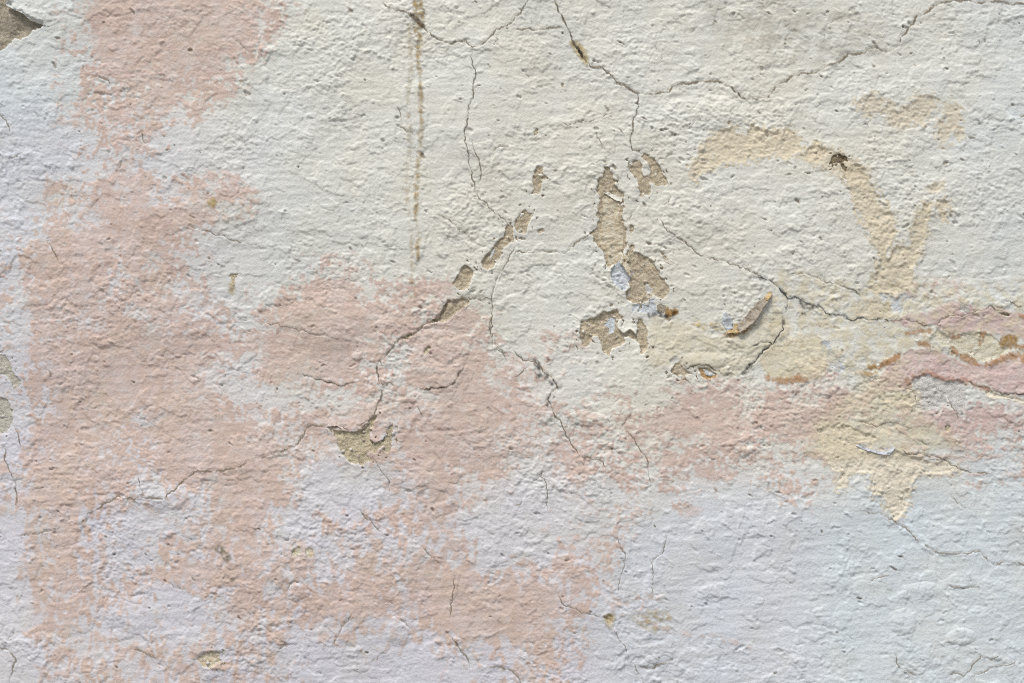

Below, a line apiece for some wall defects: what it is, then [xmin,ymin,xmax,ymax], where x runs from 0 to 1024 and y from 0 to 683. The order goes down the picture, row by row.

spalling [0,0,60,51]
crack [384,0,1024,222]
peeling [433,166,548,323]
peeling [575,150,674,360]
peeling [721,292,772,334]
crack [661,199,1022,384]
crack [77,229,604,525]
peeling [666,356,720,381]
crack [968,381,1024,423]
spalling [327,412,398,468]
crack [859,421,987,474]
crack [867,511,1024,565]